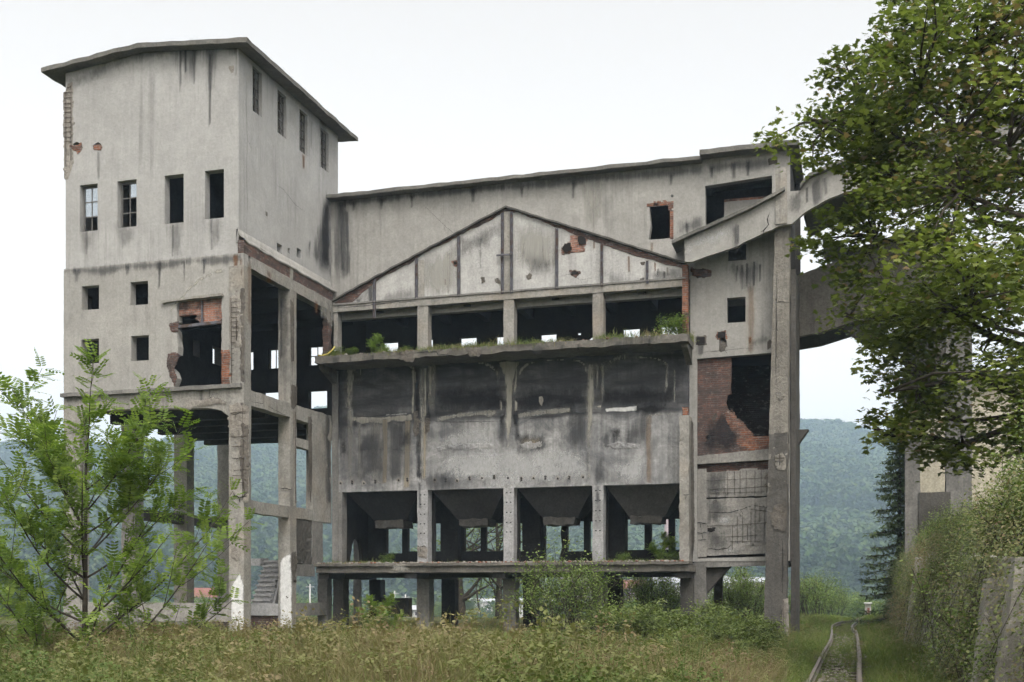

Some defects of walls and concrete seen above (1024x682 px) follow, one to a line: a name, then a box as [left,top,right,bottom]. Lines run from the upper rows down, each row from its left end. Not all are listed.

spalling [63,82,102,180]
flaking render [561,235,588,255]
flaking render [166,352,180,386]
leakage [342,361,570,479]
leakage [547,355,637,431]